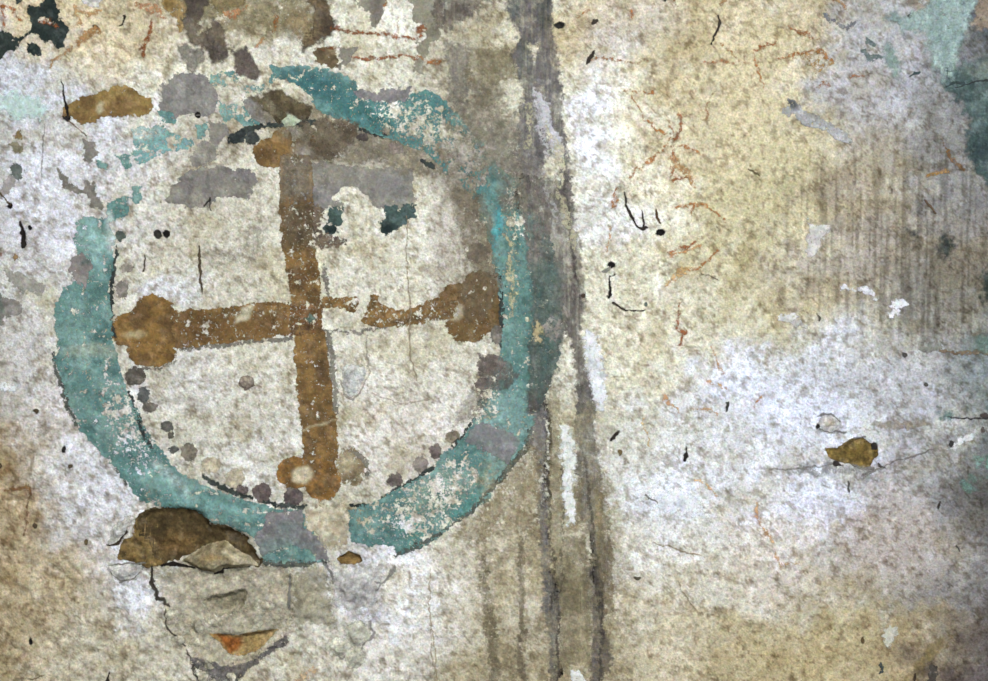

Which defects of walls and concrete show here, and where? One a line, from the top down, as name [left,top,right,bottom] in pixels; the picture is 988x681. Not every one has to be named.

leakage [178,0,335,80]
crack [946,79,988,88]
leakage [251,0,614,681]